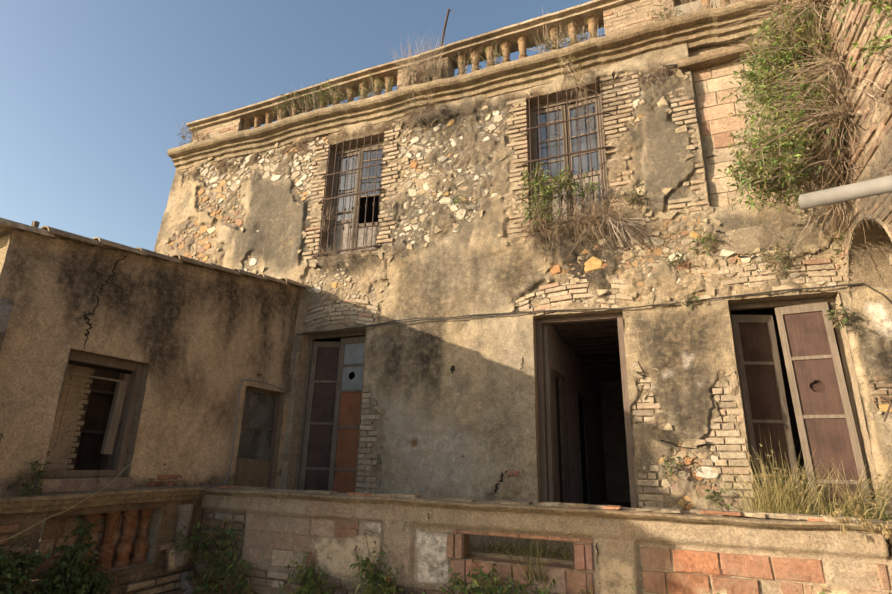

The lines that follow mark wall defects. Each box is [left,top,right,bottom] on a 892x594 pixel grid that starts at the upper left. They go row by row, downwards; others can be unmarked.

crack [76,255,128,349]
water stain [66,252,299,363]
flaking render [164,137,388,331]
flaking render [355,383,385,493]
flaking render [361,91,531,263]
flaking render [506,69,843,318]
water stain [639,311,711,438]
flaking render [628,361,754,511]